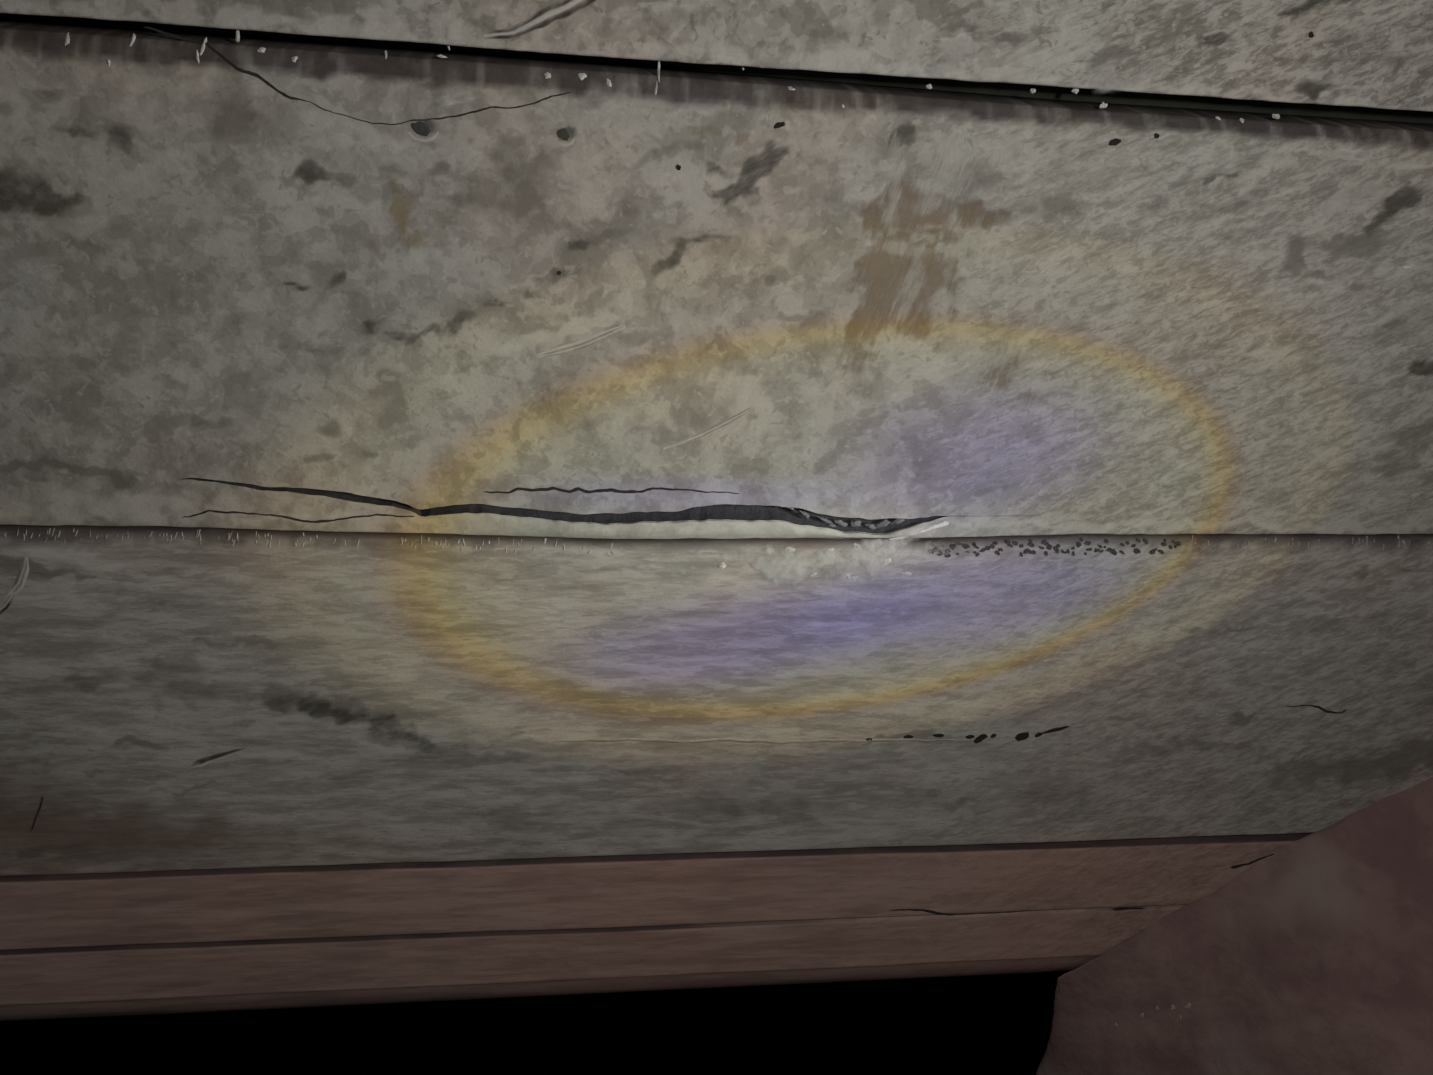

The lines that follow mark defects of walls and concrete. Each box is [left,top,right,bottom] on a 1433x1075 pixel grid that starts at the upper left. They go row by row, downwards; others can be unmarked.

crack [144,27,571,125]
crack [182,478,949,540]